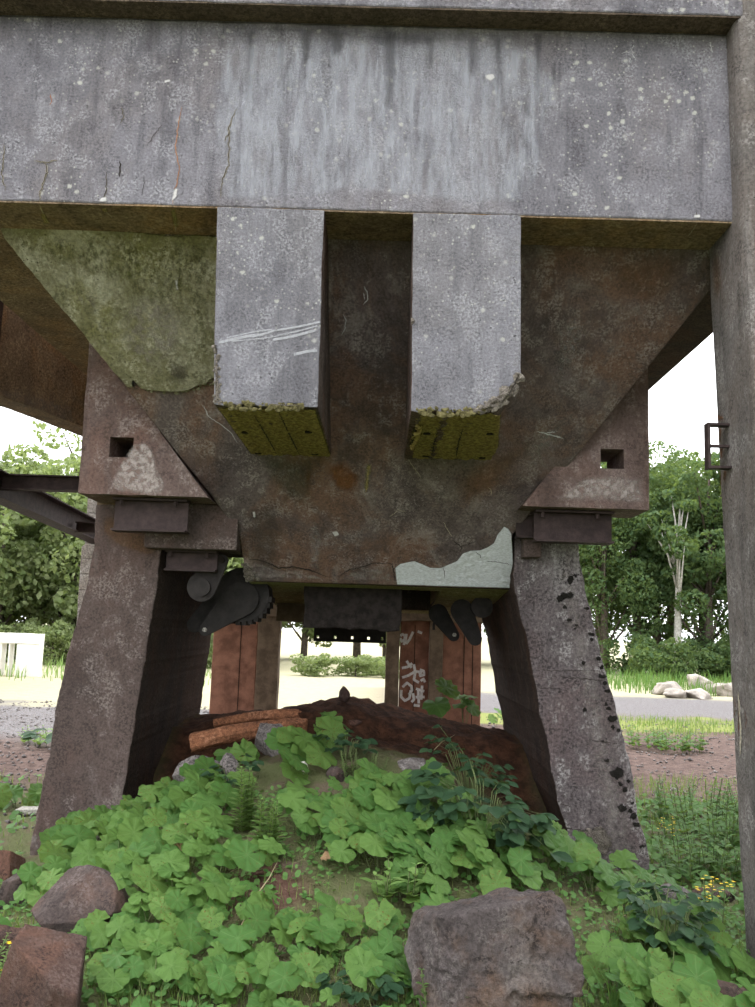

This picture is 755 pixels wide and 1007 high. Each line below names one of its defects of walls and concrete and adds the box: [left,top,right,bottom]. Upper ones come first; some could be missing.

crack [147,107,182,231]
crack [220,109,237,197]